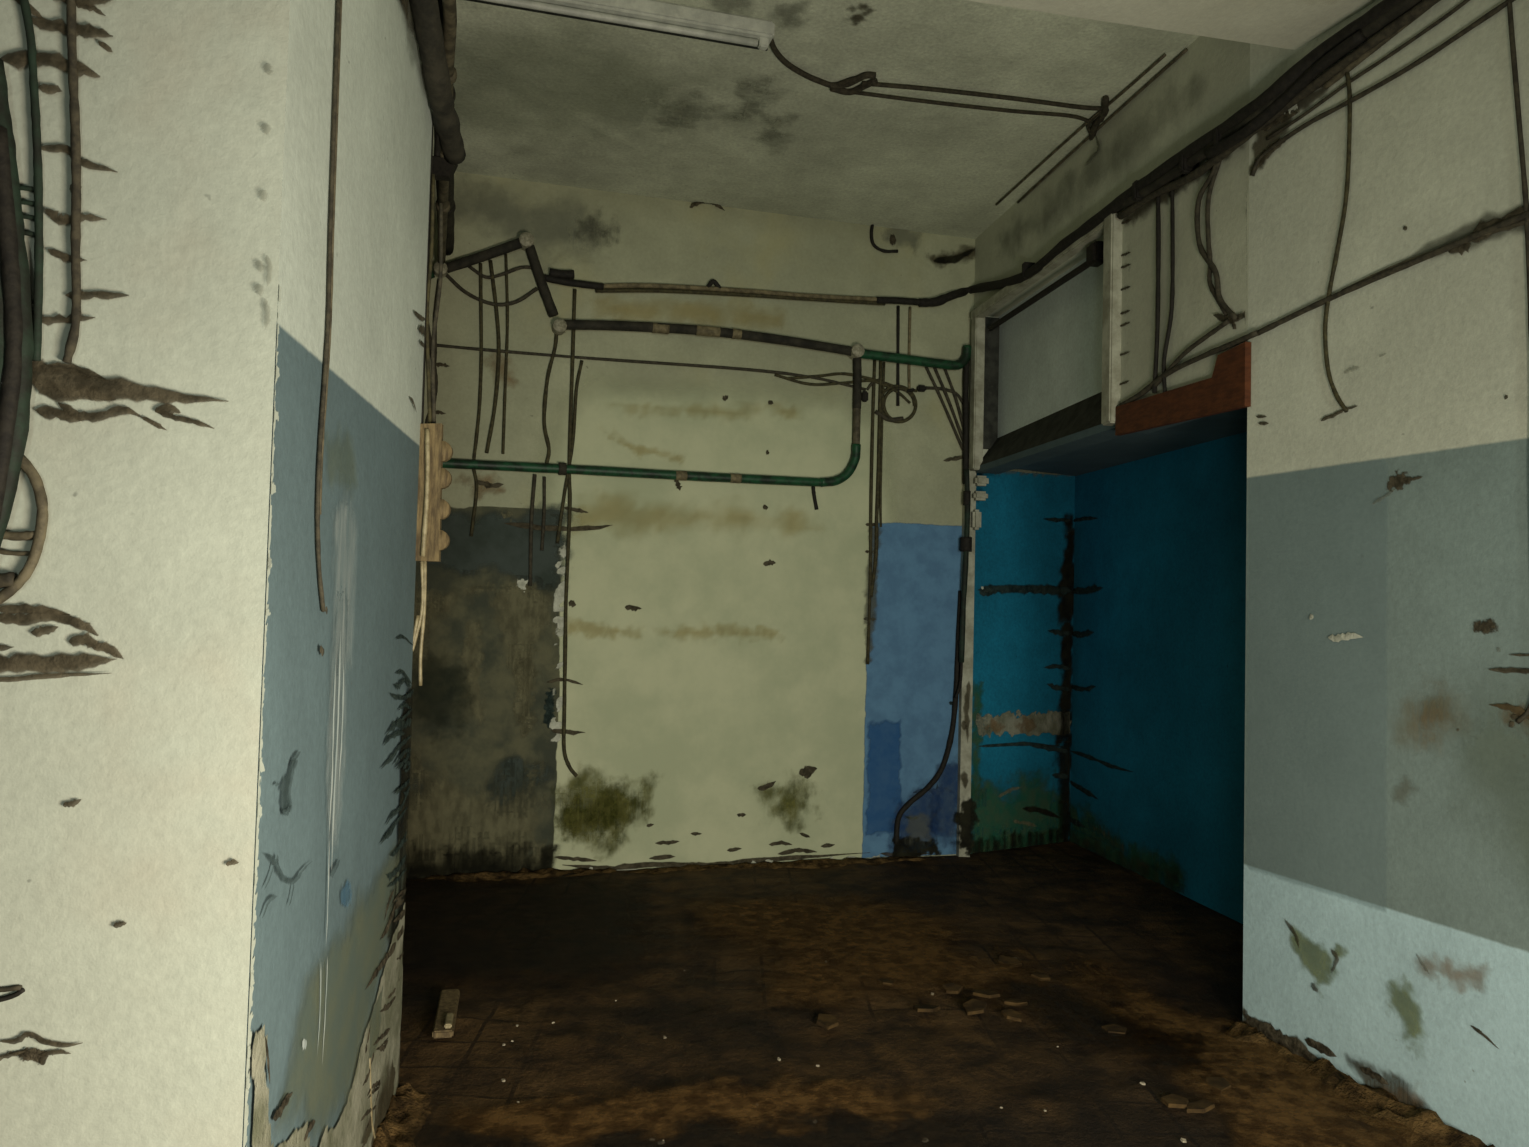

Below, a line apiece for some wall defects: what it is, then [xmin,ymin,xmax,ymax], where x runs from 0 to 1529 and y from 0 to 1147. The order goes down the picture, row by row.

spalling [976,710,1071,747]
leakage [762,784,807,829]